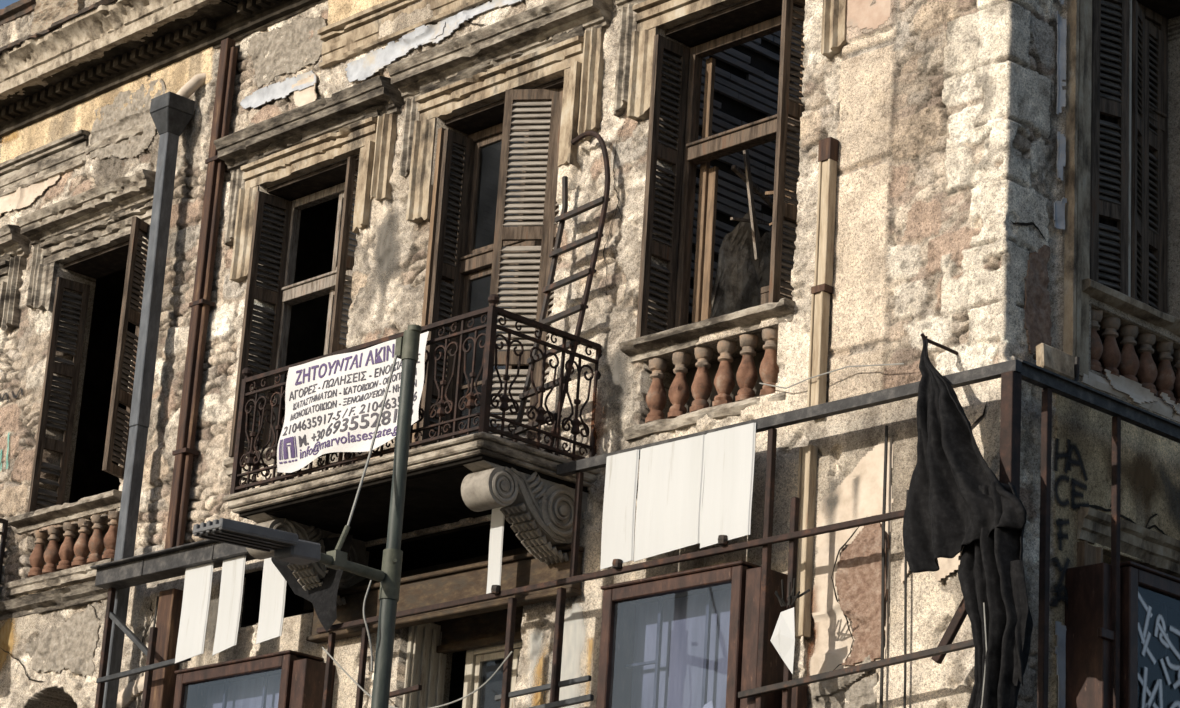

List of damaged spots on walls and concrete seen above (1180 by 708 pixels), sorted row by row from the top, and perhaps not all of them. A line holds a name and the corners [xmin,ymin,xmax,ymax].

spalling [240,15,327,109]
peeling [345,0,522,83]
peeling [0,174,60,216]
peeling [1104,369,1180,415]
damp [1110,456,1180,528]
peeling [810,438,911,708]
peeling [935,552,961,581]